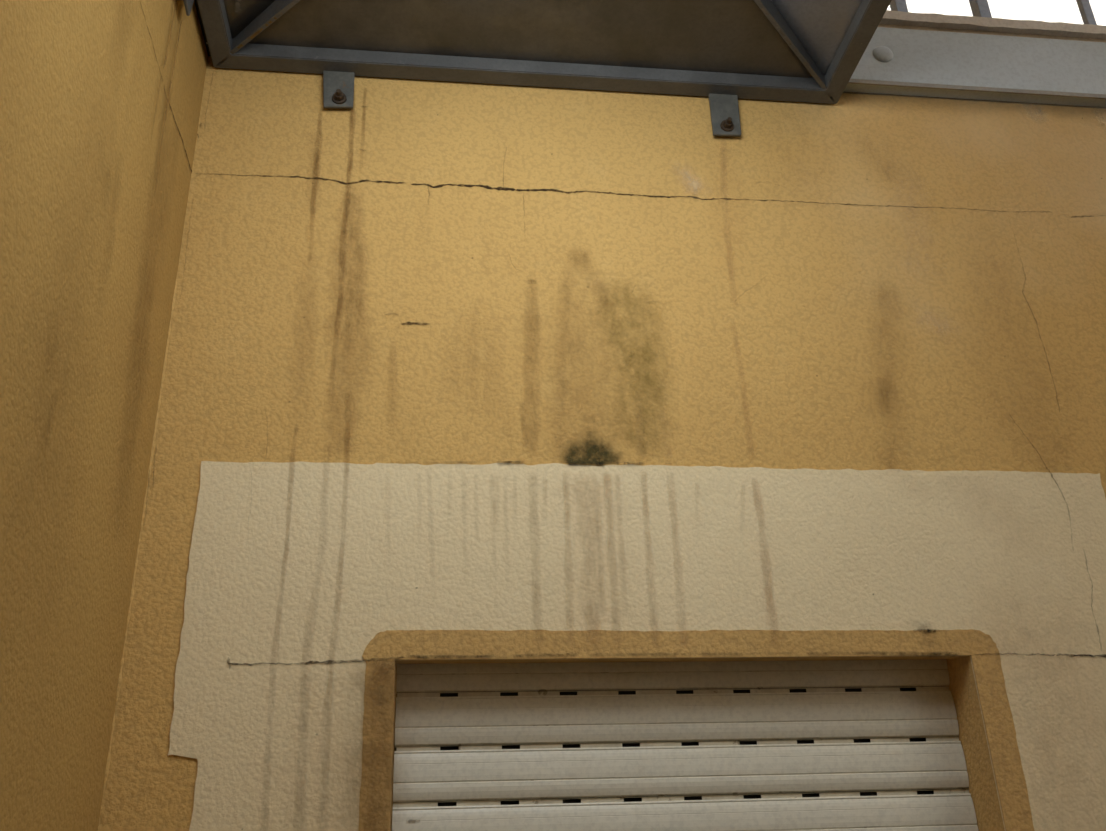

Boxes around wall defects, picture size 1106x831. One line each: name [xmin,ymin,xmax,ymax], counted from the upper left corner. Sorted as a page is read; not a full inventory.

crack [218,174,928,208]
crack [1000,651,1106,659]
crack [227,657,405,666]